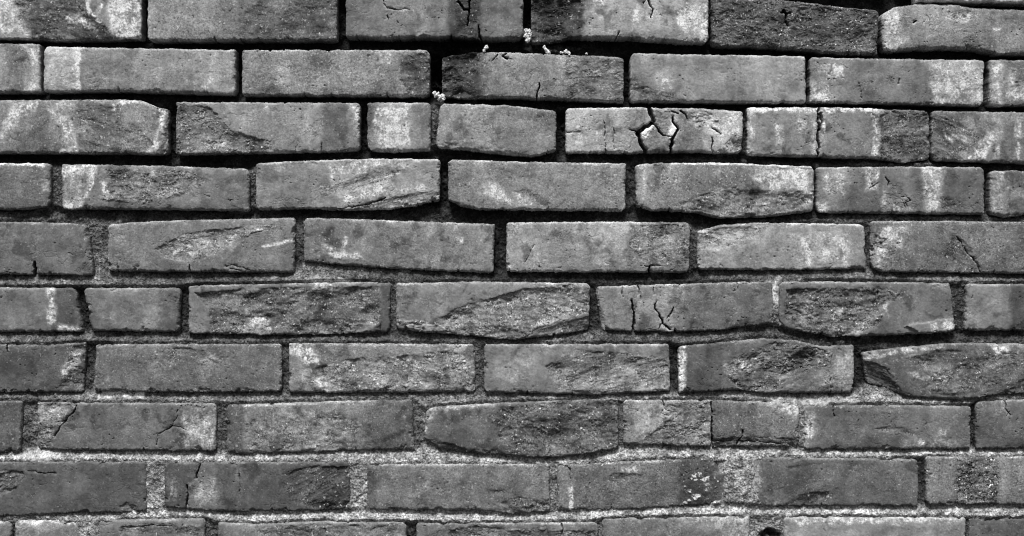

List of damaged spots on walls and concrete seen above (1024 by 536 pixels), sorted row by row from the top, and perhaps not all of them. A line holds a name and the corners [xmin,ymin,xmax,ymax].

crack [457,0,511,61]
crack [565,108,688,154]
crack [956,236,982,273]
crack [621,264,674,330]
crack [53,405,77,437]
crack [156,409,187,445]